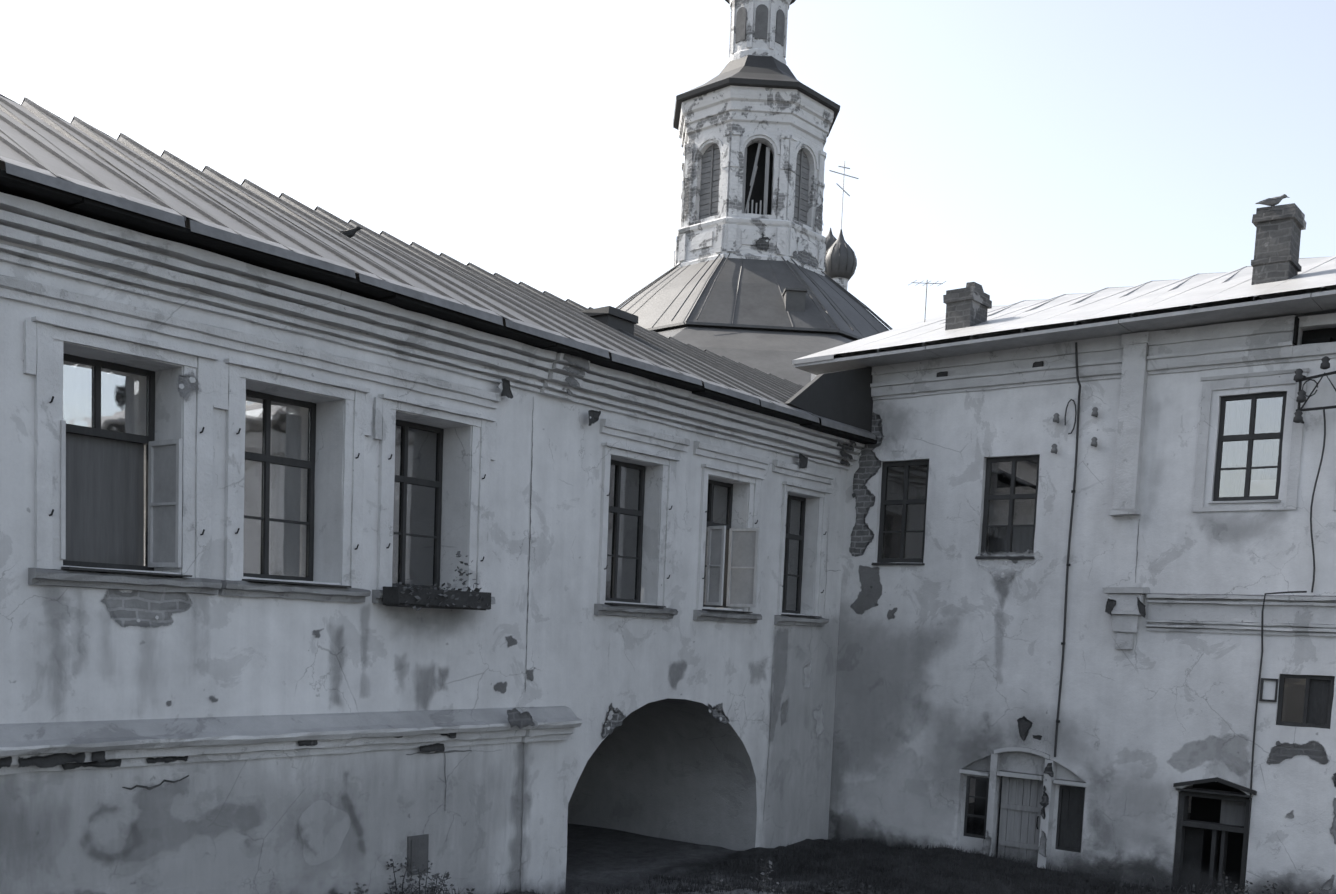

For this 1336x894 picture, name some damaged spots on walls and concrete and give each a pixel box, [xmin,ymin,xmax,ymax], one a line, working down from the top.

spalling [682,168,691,220]
spalling [814,198,824,231]
spalling [756,233,770,251]
spalling [793,250,820,268]
flaking render [837,412,897,619]
spalling [102,589,191,627]
flaking render [1267,741,1336,844]